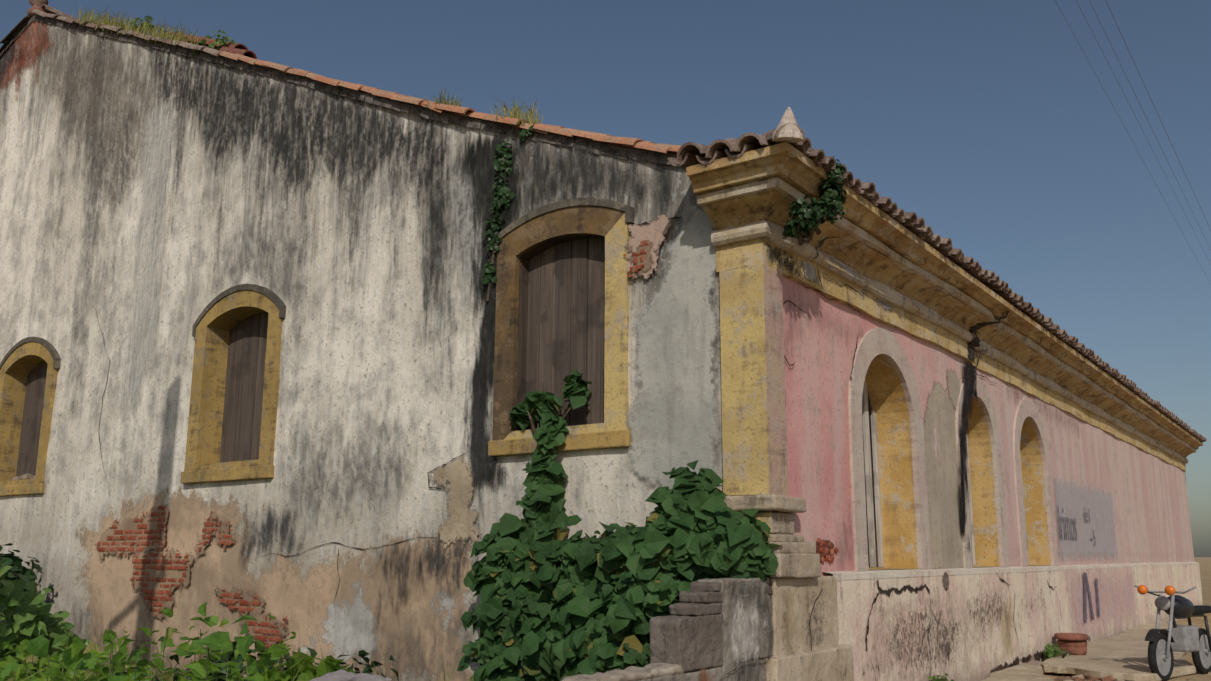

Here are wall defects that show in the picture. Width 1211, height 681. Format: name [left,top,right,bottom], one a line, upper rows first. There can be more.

corrosion [0,21,52,100]
leakage [45,32,672,509]
flaking render [623,214,680,280]
crack [968,311,1009,384]
flaking render [923,369,964,569]
leakage [958,362,978,548]
flaking render [75,451,481,681]
leakage [380,533,478,603]
flaking render [816,538,839,563]
crack [866,580,938,681]